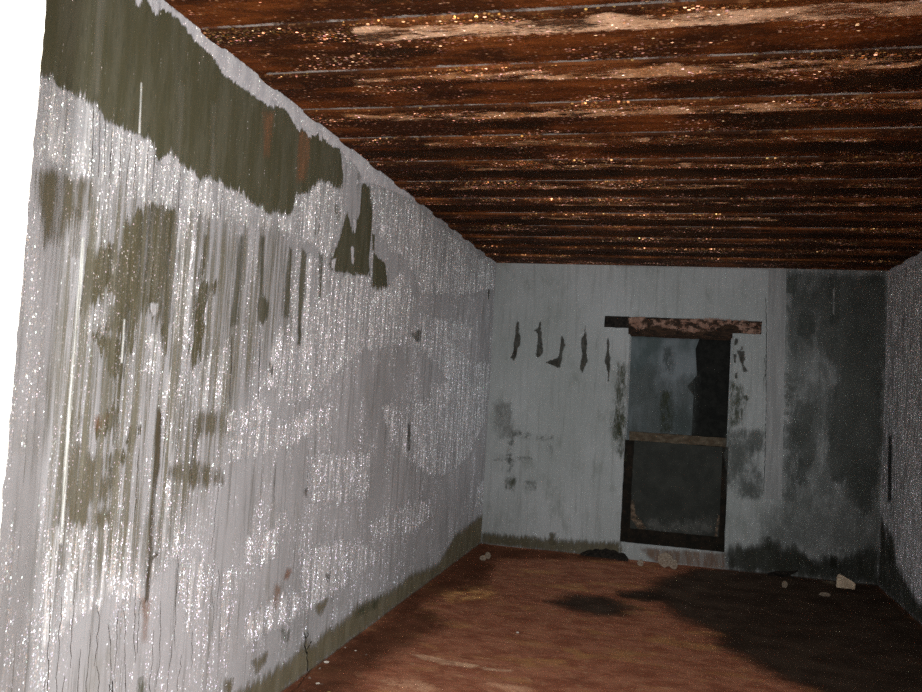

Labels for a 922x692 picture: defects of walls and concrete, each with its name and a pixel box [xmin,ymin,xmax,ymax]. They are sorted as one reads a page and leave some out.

peeling [352,0,922,43]
peeling [356,55,922,88]
peeling [40,0,343,216]
peeling [344,102,844,121]
peeling [329,183,387,291]
water stain [829,252,922,321]
water stain [33,0,494,651]
peeling [535,322,565,368]
peeling [580,330,588,372]
water stain [225,481,622,692]
water stain [550,519,922,692]
crack [298,632,312,687]